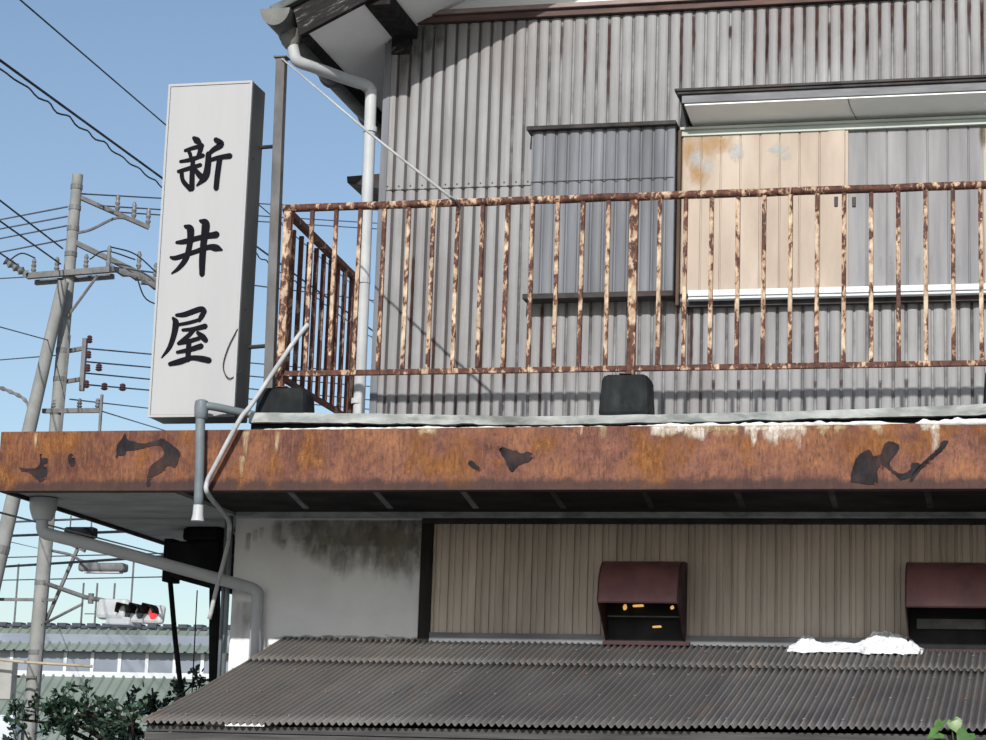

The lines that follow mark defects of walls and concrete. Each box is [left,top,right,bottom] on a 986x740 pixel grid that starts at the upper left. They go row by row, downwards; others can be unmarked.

rust [539,307,553,389]
rust [676,307,693,364]
peeling [20,453,48,482]
peeling [115,433,181,487]
peeling [498,445,534,472]
peeling [851,440,948,485]